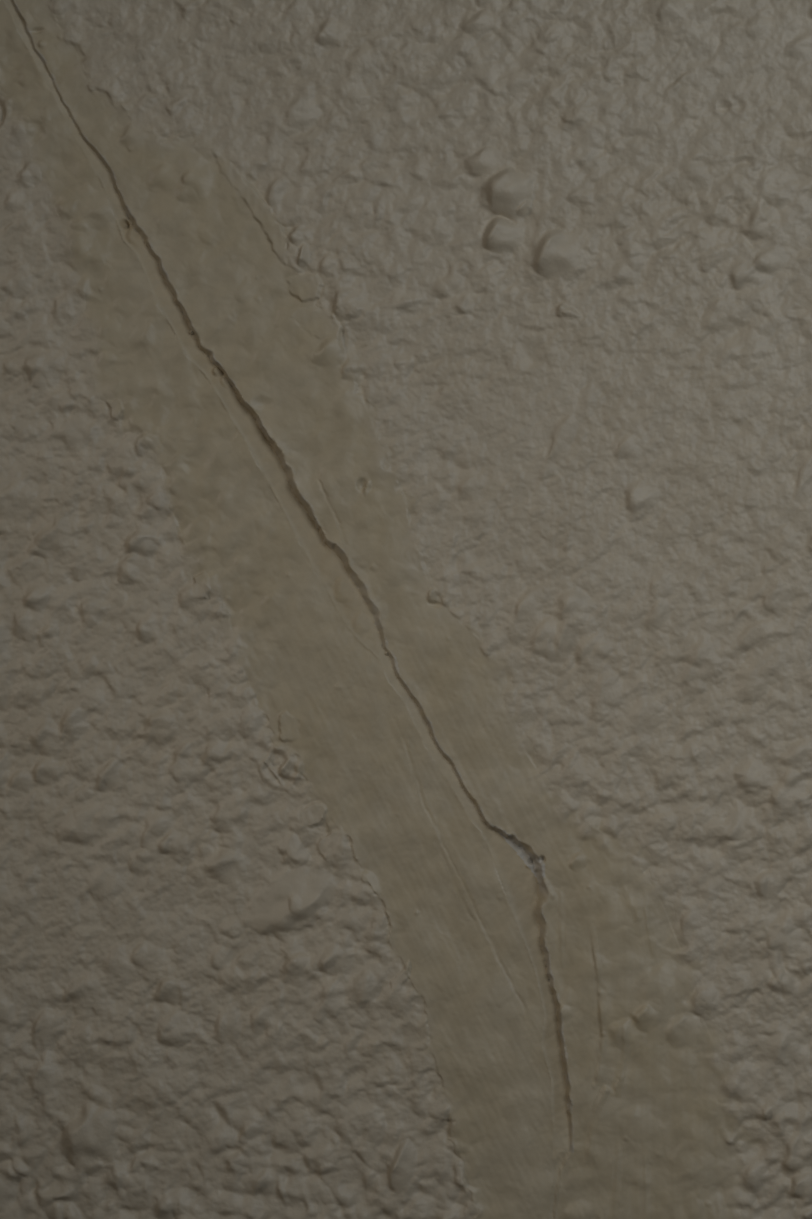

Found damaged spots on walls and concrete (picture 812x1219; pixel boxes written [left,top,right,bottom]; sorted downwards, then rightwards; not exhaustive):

crack [5,0,574,1219]